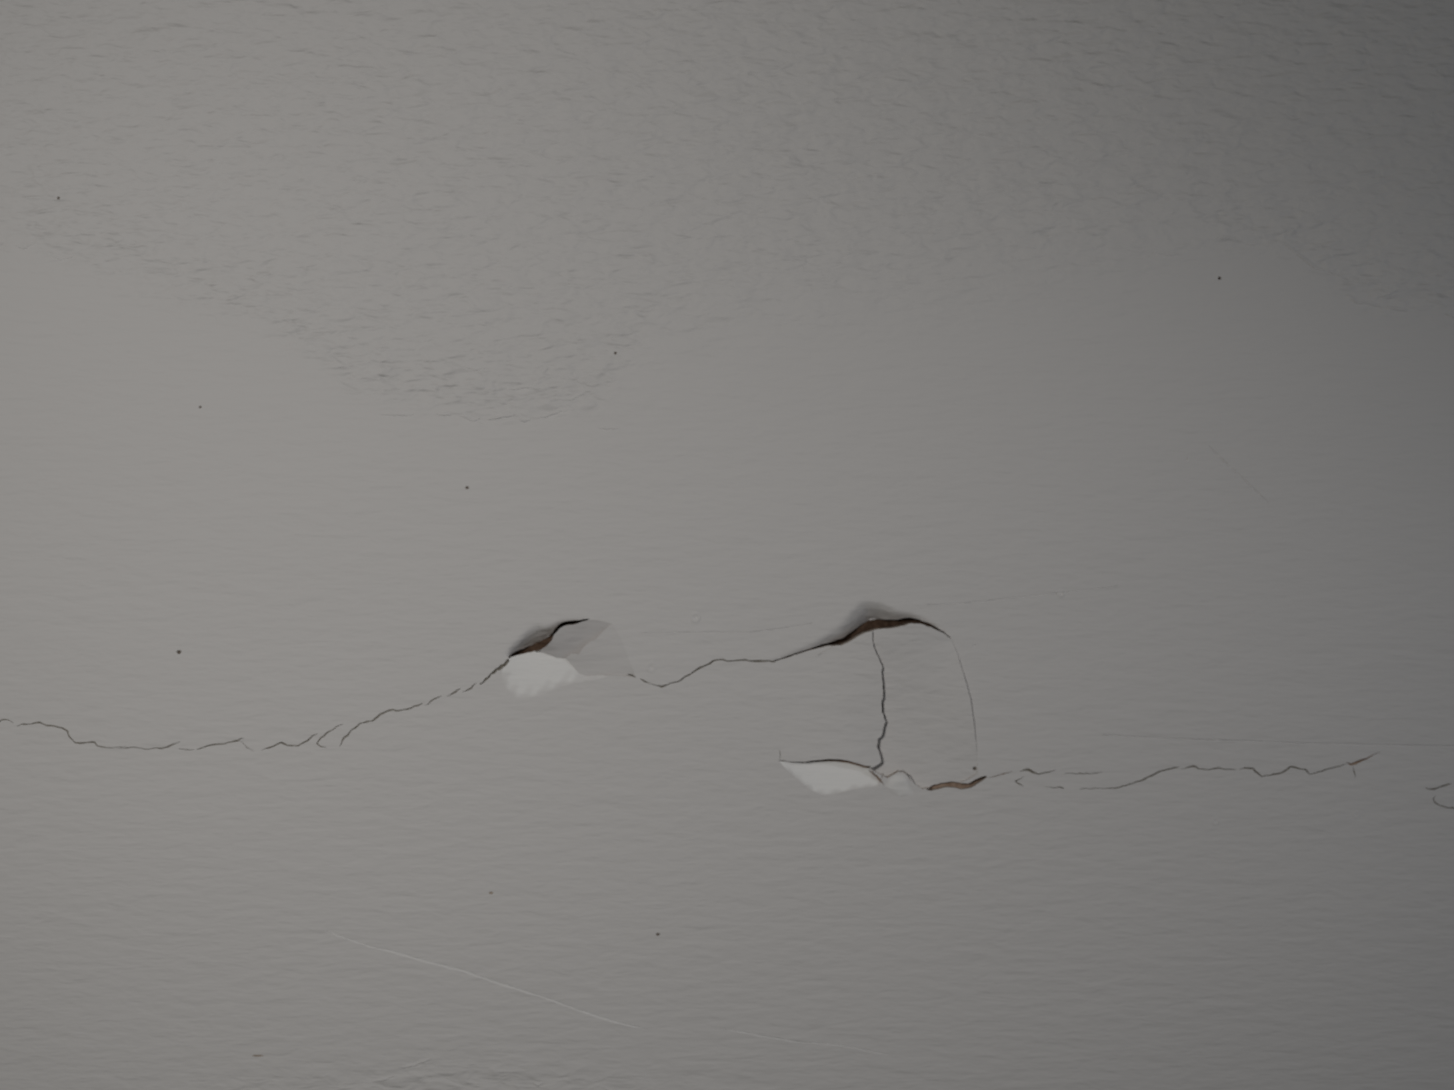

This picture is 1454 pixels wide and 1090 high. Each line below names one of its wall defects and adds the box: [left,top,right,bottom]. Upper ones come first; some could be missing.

crack [0,659,509,751]
flaking render [501,619,635,699]
crack [627,659,775,688]
crack [813,617,941,757]
flaking render [779,750,884,795]
crack [989,752,1379,790]
crack [1426,783,1454,809]